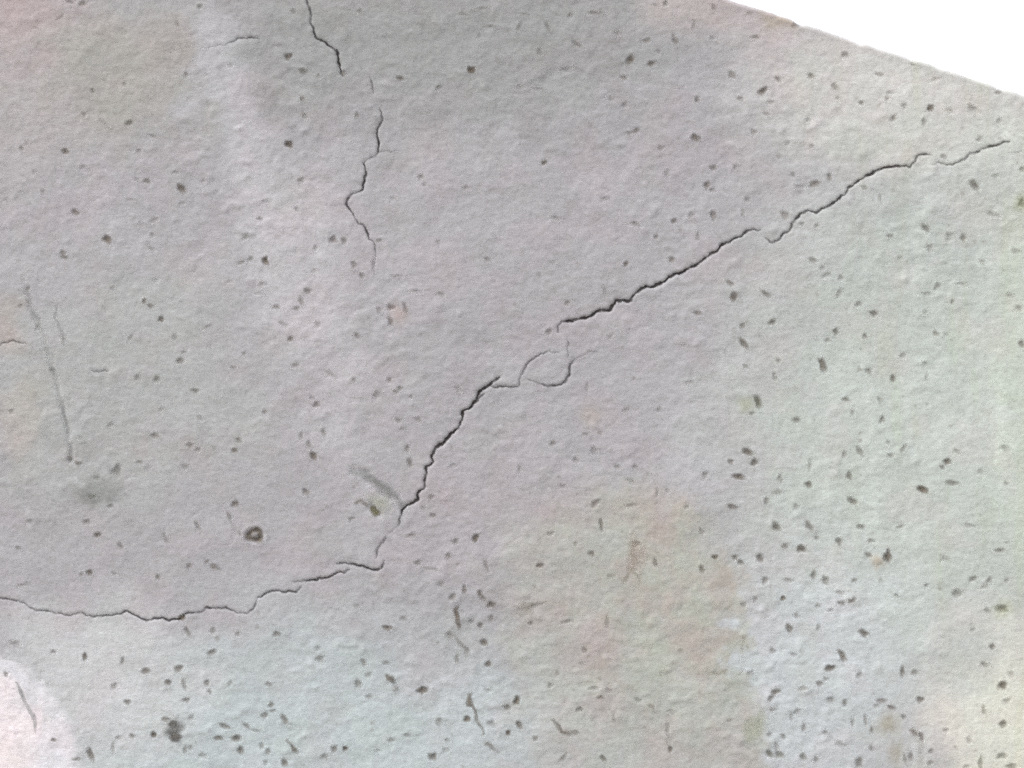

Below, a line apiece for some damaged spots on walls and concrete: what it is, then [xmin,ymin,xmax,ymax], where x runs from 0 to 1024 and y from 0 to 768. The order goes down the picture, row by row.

crack [306,0,342,73]
crack [345,110,382,237]
crack [560,141,1010,324]
crack [399,356,572,521]
crack [40,551,384,621]